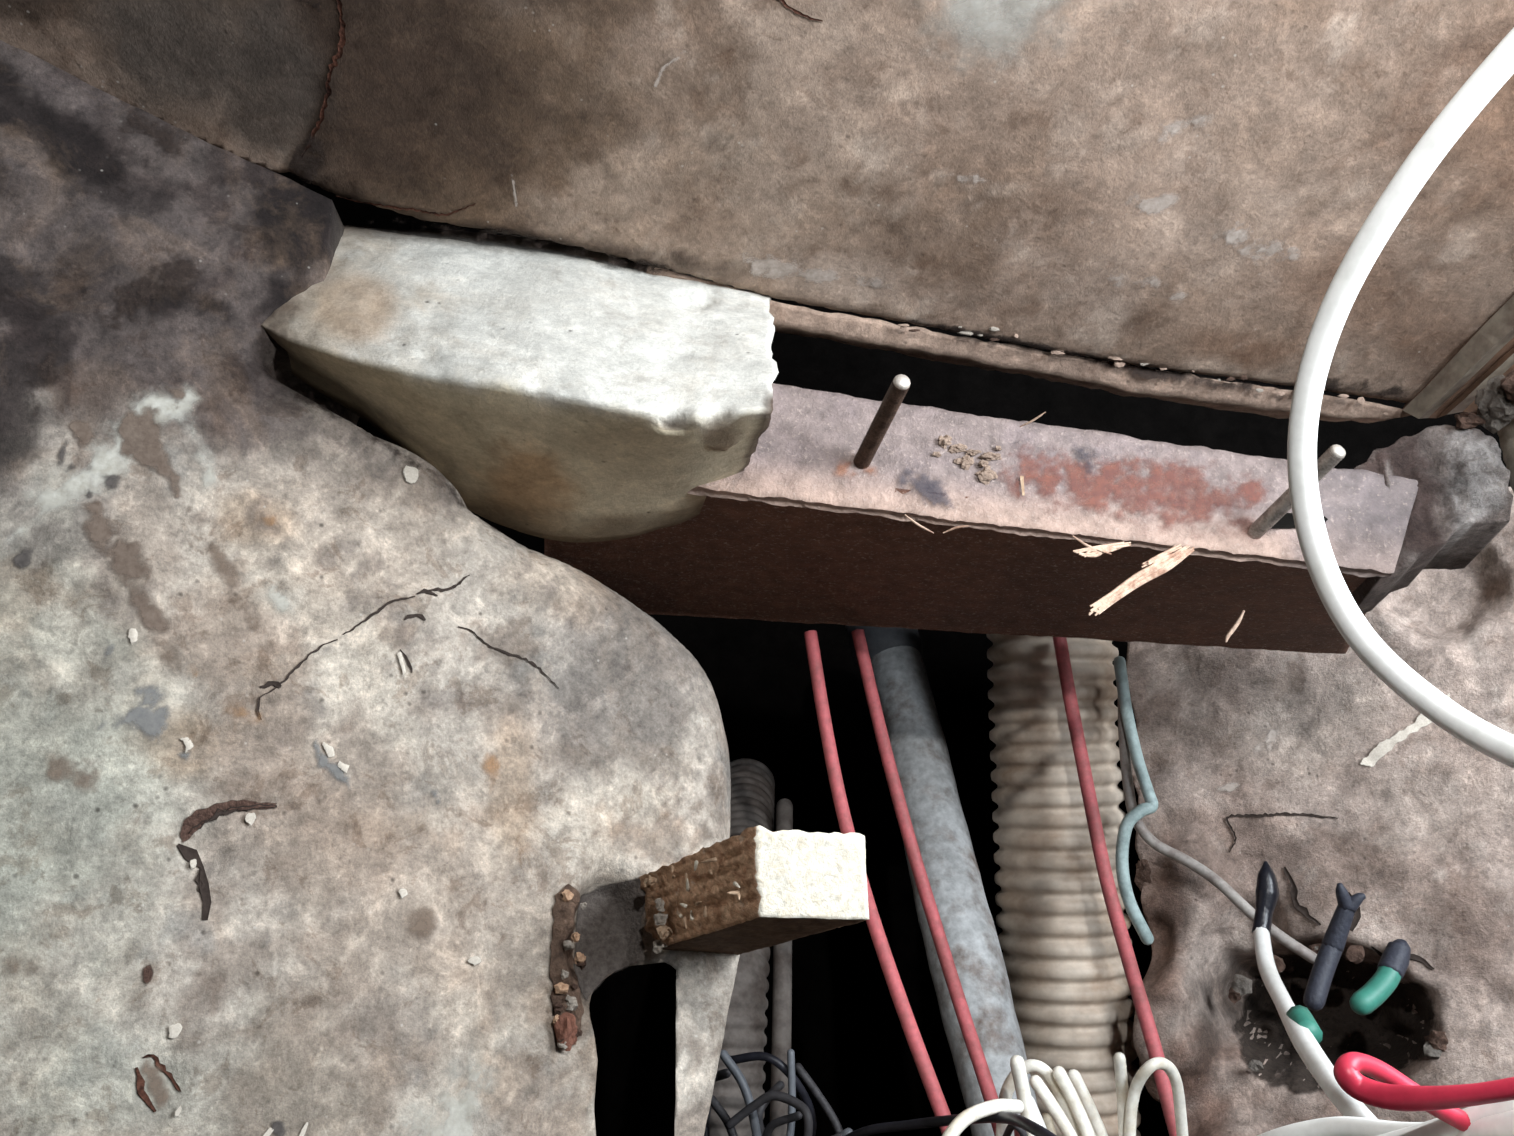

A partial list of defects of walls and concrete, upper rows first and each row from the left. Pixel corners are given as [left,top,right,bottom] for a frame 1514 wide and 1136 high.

crack [289,0,476,216]
peeling [898,320,1294,396]
leakage [31,389,198,632]
rust [1008,454,1265,526]
crack [256,575,559,720]